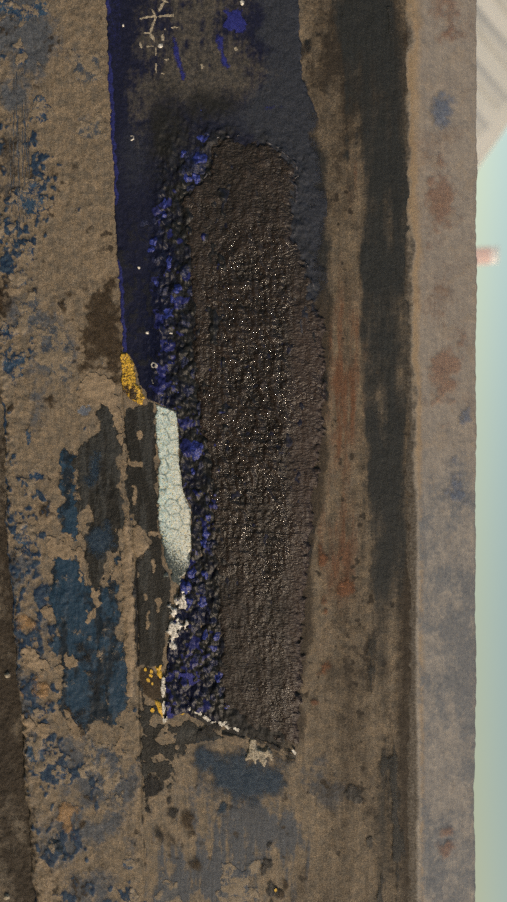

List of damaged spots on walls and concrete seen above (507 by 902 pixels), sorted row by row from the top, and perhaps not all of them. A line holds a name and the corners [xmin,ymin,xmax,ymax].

peeling [0,0,55,27]
peeling [0,216,145,446]
peeling [119,459,143,476]
peeling [46,524,84,583]
peeling [40,606,54,619]
peeling [85,587,102,624]
peeling [21,646,78,676]
peeling [21,705,129,806]
peeling [216,860,264,902]